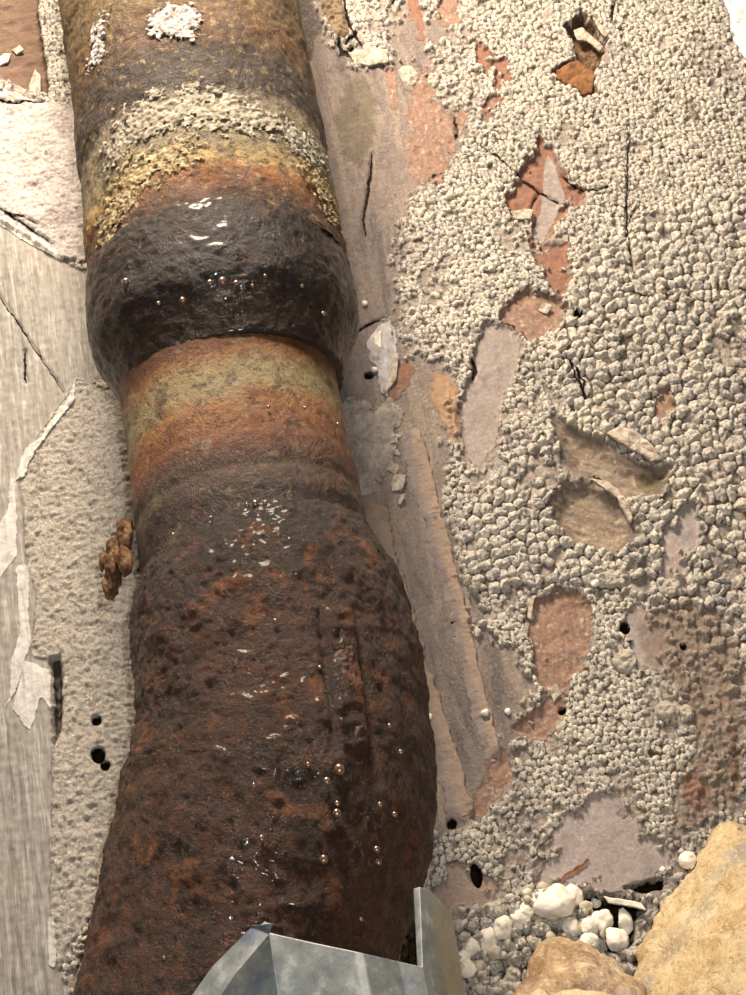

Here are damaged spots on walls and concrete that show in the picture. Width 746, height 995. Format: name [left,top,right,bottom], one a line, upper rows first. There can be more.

crack [337,0,363,55]
peeling [474,41,512,121]
spalling [551,12,608,98]
peeling [723,0,746,58]
crack [362,154,373,235]
crack [477,122,655,297]
crack [0,297,63,391]
peeling [459,134,586,471]
peeling [342,318,415,505]
spalling [554,422,666,552]
peeling [0,216,104,995]
spalling [511,792,746,995]